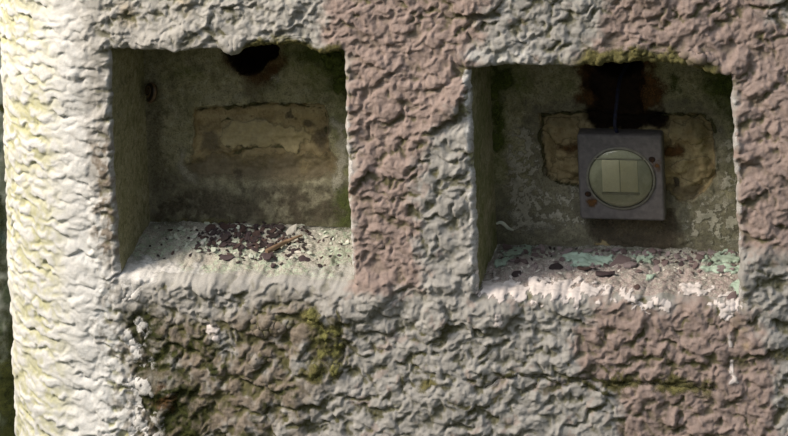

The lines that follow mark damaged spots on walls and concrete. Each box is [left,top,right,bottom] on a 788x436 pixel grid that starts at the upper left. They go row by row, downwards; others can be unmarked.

corrosion [575,61,669,129]
flaking render [178,102,349,191]
flaking render [504,112,595,231]
flaking render [632,114,743,321]
peeling [475,240,671,314]